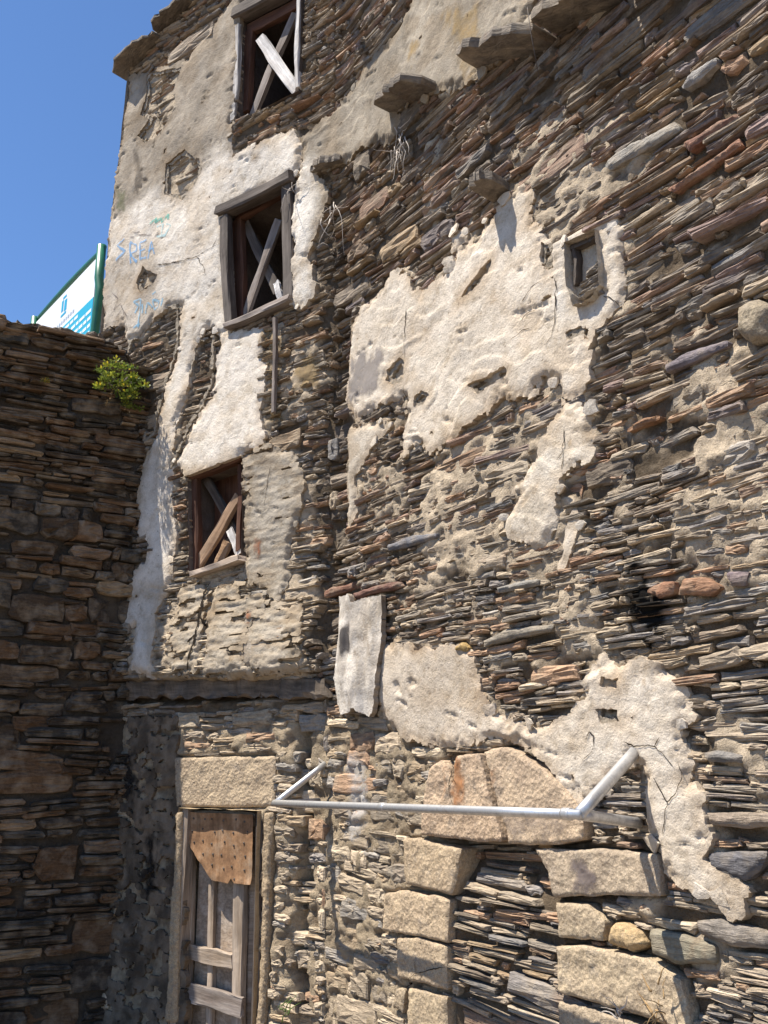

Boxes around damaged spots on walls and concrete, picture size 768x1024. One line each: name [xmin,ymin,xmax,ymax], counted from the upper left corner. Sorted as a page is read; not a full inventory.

crack [154,238,220,273]
flaking render [103,0,538,680]
crack [623,738,682,835]